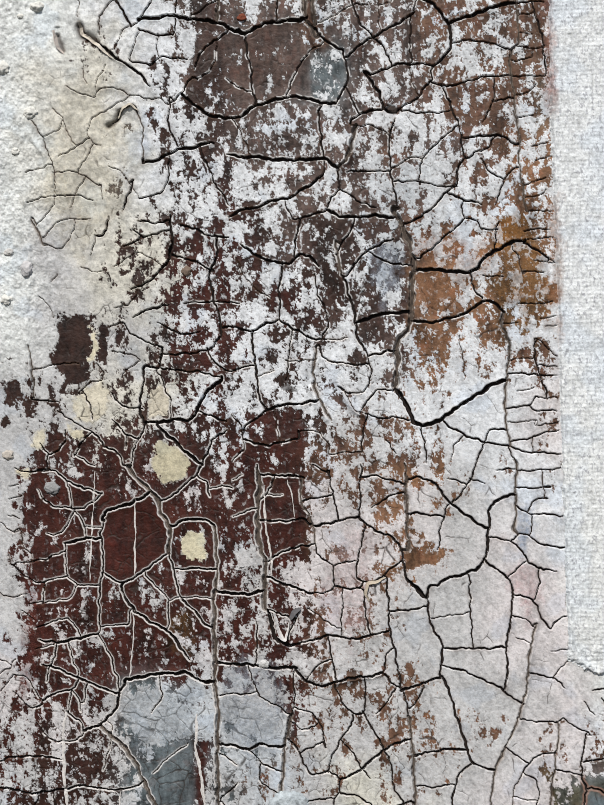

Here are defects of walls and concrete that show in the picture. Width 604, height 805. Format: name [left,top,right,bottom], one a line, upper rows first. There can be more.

peeling [187,0,547,159]
peeling [44,314,110,407]
peeling [164,210,233,387]
crack [9,0,560,675]
peeling [309,217,463,364]
peeling [0,419,224,805]
crack [0,465,368,805]
peeling [229,407,310,659]
crack [266,447,568,805]
crack [520,718,604,805]